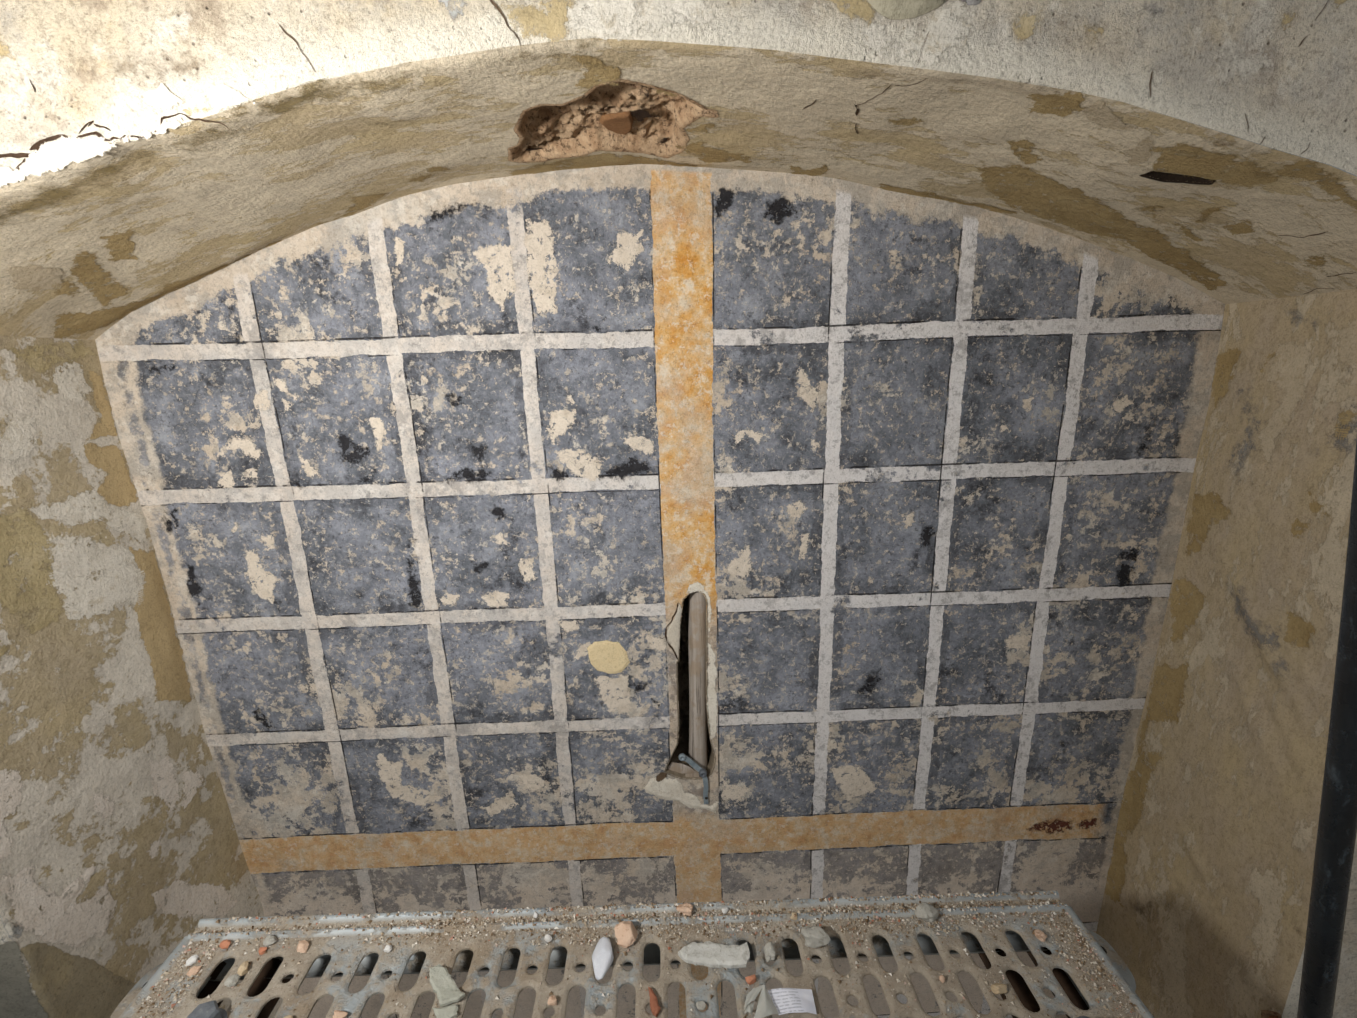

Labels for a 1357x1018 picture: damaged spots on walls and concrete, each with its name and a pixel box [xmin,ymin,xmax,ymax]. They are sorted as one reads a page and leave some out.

crack [490,0,521,46]
crack [0,113,230,172]
spalling [0,82,255,187]
spalling [507,54,752,176]
peeling [1123,137,1357,210]
peeling [879,139,1255,291]
peeling [0,230,284,702]
peeling [368,417,387,457]
peeling [594,674,632,715]
peeling [646,582,718,739]
peeling [376,753,443,806]
spalling [633,772,750,814]